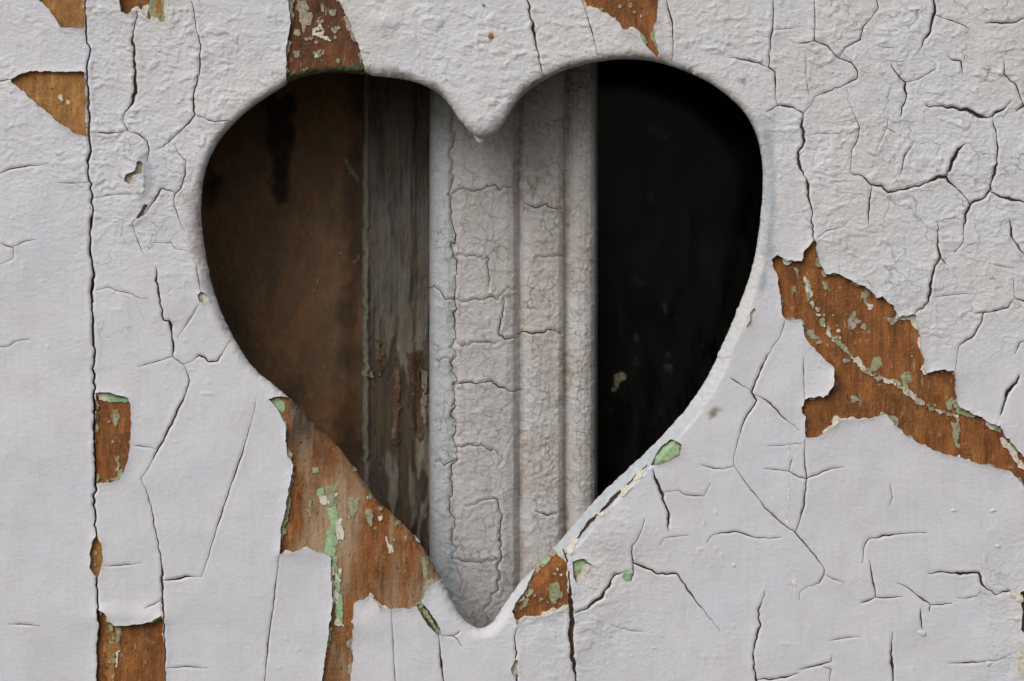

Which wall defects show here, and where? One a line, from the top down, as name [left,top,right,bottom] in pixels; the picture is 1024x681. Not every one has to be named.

peeling [12,70,90,139]
peeling [284,0,373,86]
crack [733,0,1024,369]
peeling [95,392,132,484]
crack [0,2,255,681]
peeling [98,611,165,681]
peeling [269,394,443,681]
crack [424,113,561,609]
crack [562,321,857,681]
peeling [772,240,1024,487]
crack [861,532,1010,629]
crack [1000,341,1023,415]